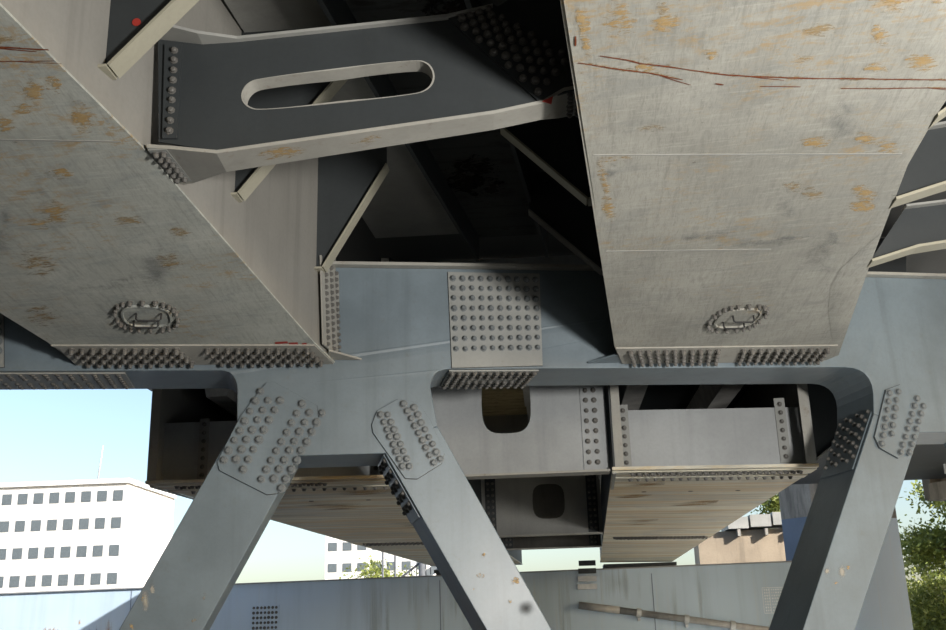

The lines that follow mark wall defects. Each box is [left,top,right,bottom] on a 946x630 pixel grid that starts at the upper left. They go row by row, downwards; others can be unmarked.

corrosion [0,37,48,63]
corrosion [575,10,946,90]
corrosion [0,77,62,131]